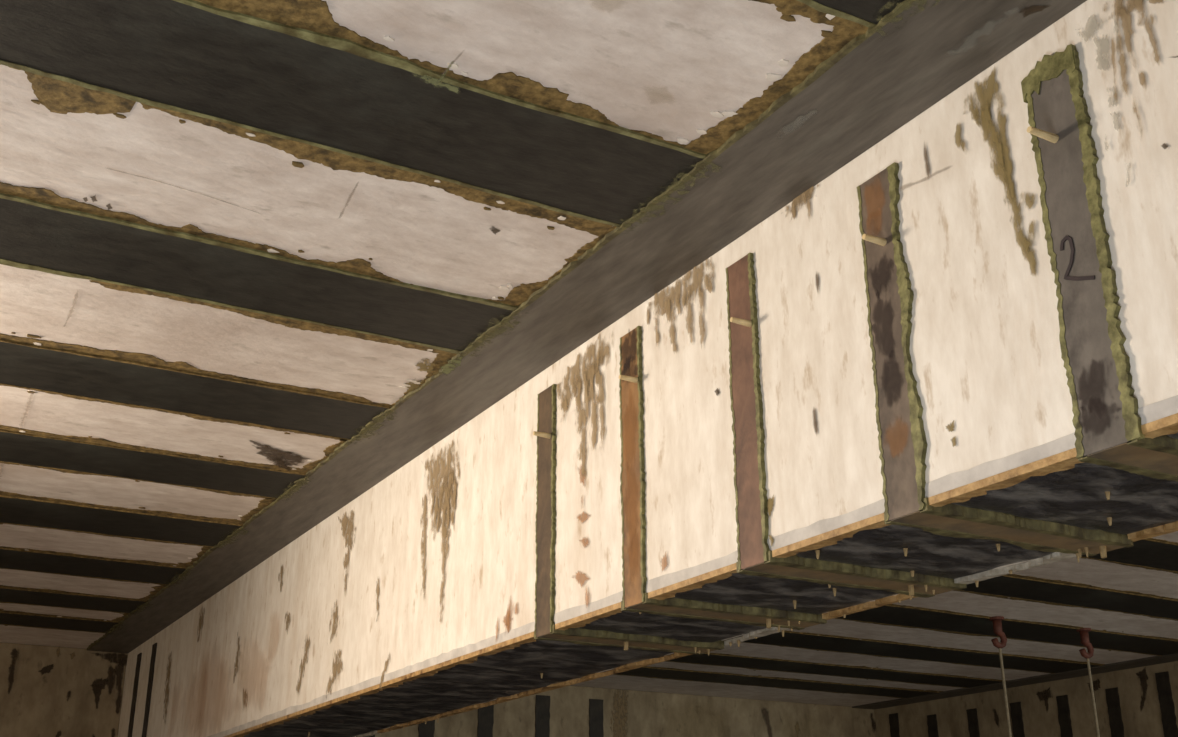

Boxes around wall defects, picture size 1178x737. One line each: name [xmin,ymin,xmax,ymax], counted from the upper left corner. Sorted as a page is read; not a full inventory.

peeling [194,0,869,155]
damp [1079,0,1163,150]
peeling [0,64,616,306]
damp [955,69,1036,275]
damp [647,259,714,352]
damp [249,440,308,471]
damp [557,331,637,476]
damp [421,441,460,622]
damp [8,649,18,694]
damp [91,653,128,714]